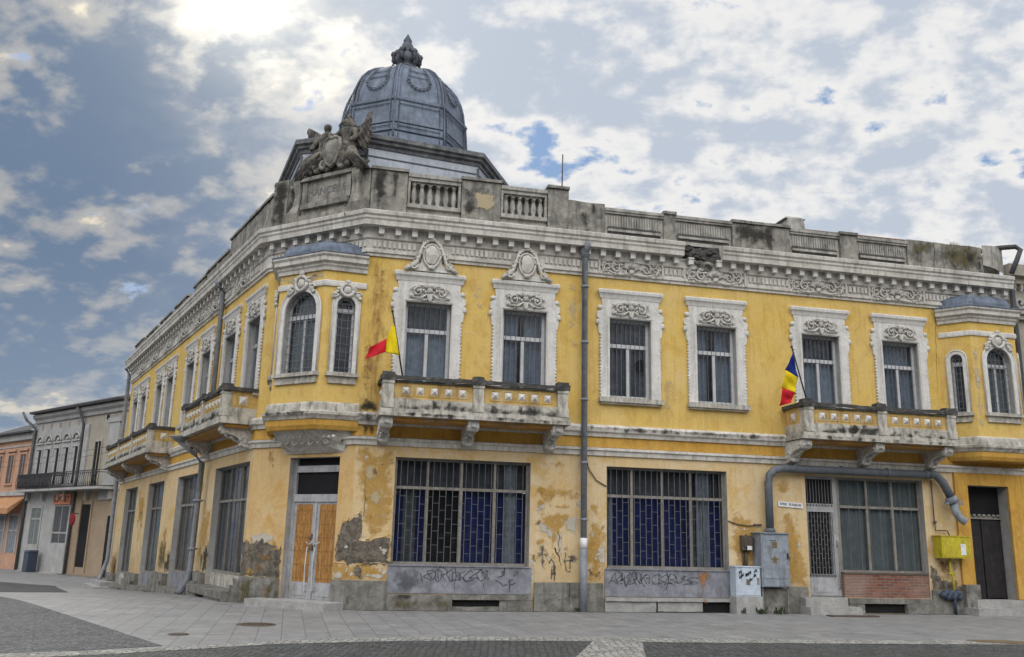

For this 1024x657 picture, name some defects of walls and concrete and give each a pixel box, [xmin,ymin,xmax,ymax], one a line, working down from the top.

damp [465,189,494,213]
damp [736,225,774,248]
damp [400,401,469,418]
damp [491,406,560,423]
damp [823,425,878,441]
flaking render [333,449,393,579]
peeling [530,485,606,580]
flaking render [239,532,283,578]